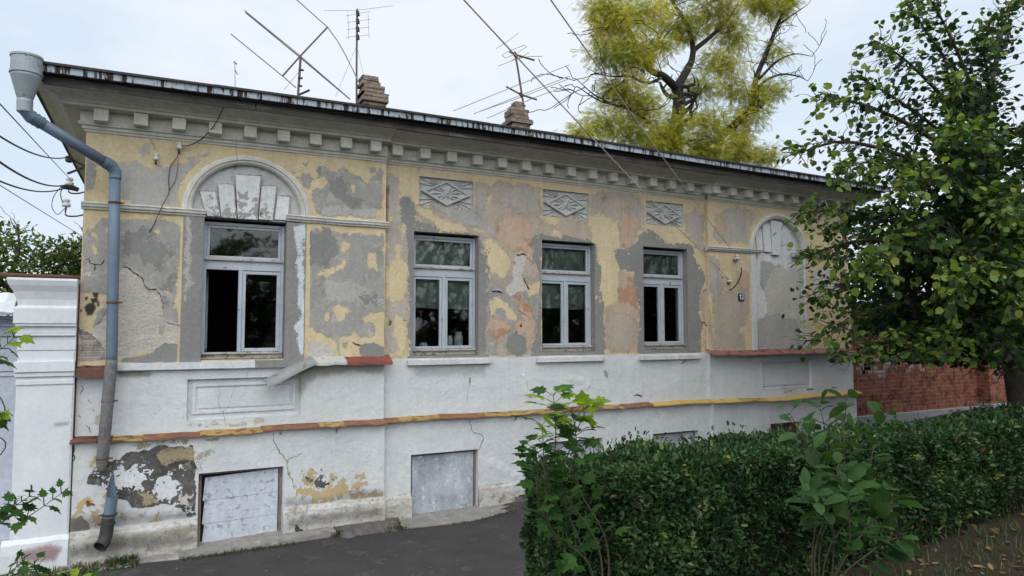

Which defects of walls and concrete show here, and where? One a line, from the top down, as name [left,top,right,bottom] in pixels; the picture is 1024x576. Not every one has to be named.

peeling [78,138,209,362]
peeling [290,162,647,358]
peeling [700,205,839,351]
peeling [71,492,107,532]
peeling [116,510,161,523]
peeling [285,459,384,506]